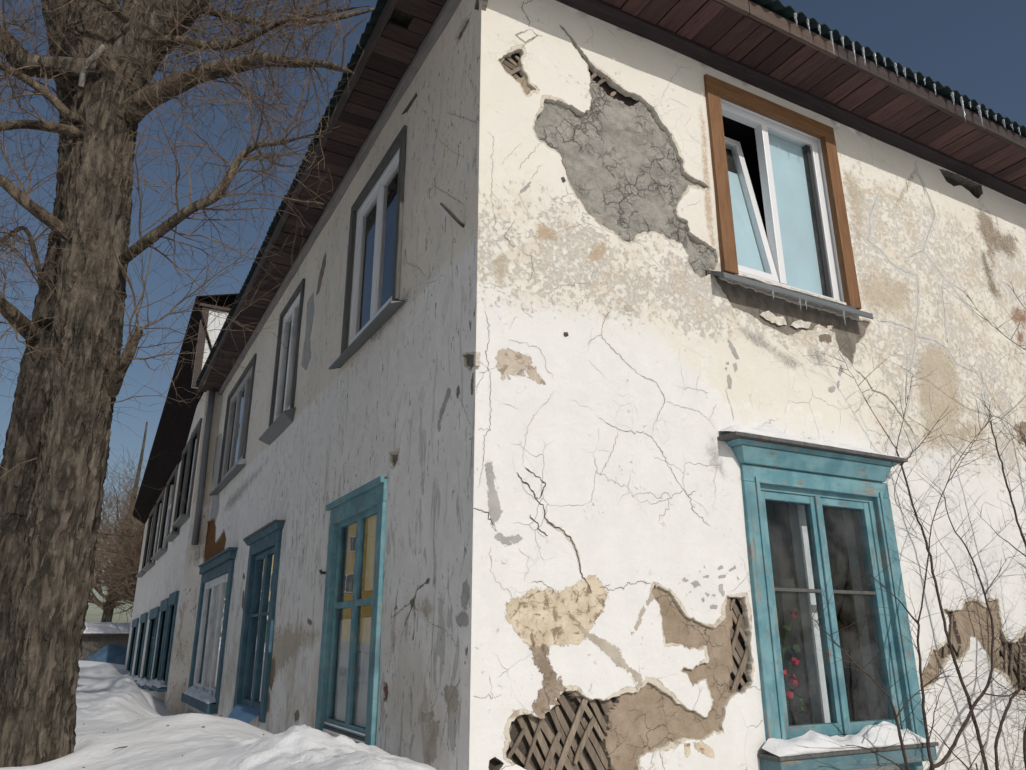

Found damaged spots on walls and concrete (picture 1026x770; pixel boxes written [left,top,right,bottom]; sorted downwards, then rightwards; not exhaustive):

crack [491,141,540,244]
spalling [495,24,872,393]
spalling [437,351,480,432]
crack [589,302,734,523]
peeling [1013,421,1026,444]
spalling [203,433,226,563]
crack [395,309,647,741]
spalling [488,565,755,770]
spalling [922,595,1026,696]